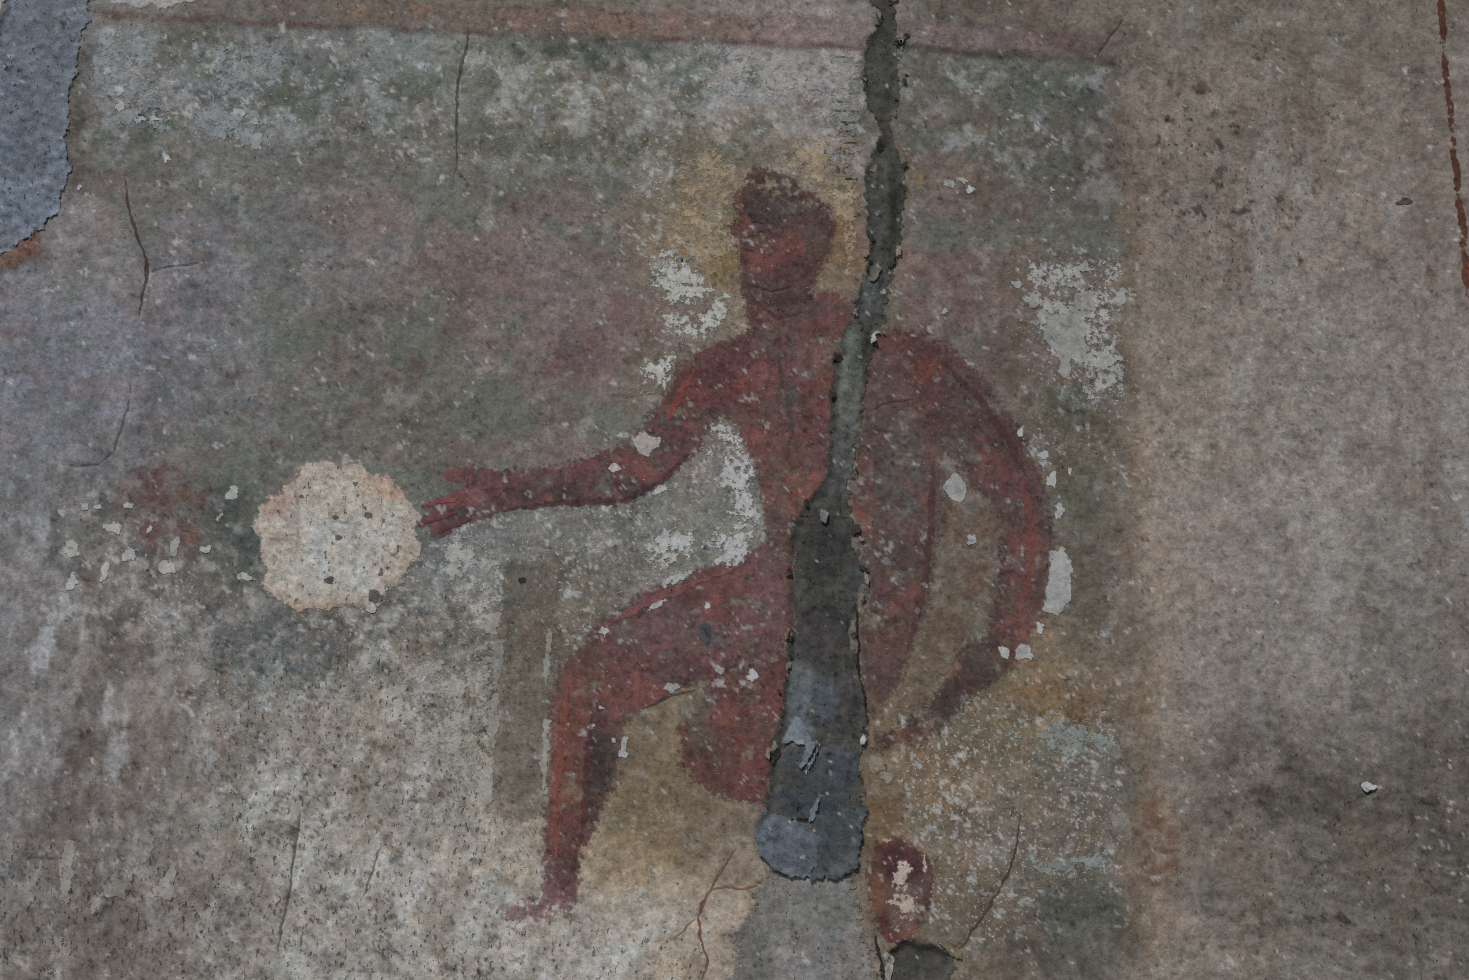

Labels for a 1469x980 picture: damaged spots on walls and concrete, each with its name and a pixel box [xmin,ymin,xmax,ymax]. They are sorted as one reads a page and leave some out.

peeling [628,148,733,404]
peeling [1011,258,1128,419]
crack [674,0,908,980]
spalling [365,567,384,613]
peeling [859,755,893,833]
spalling [883,854,962,980]